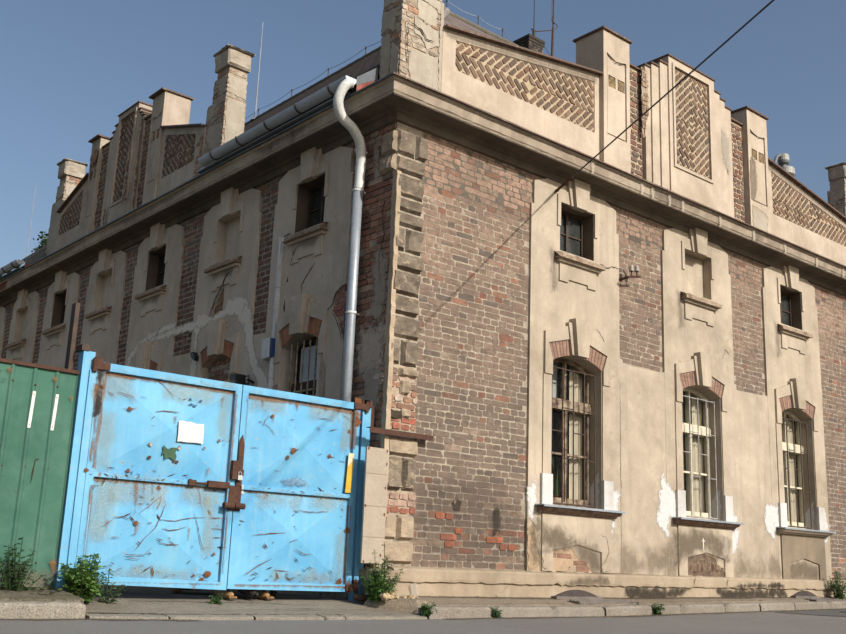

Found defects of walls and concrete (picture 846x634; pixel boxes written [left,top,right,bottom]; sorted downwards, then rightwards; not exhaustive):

flaking render [379,0,441,79]
rust [84,372,237,567]
rust [249,394,362,449]
rust [236,497,351,593]